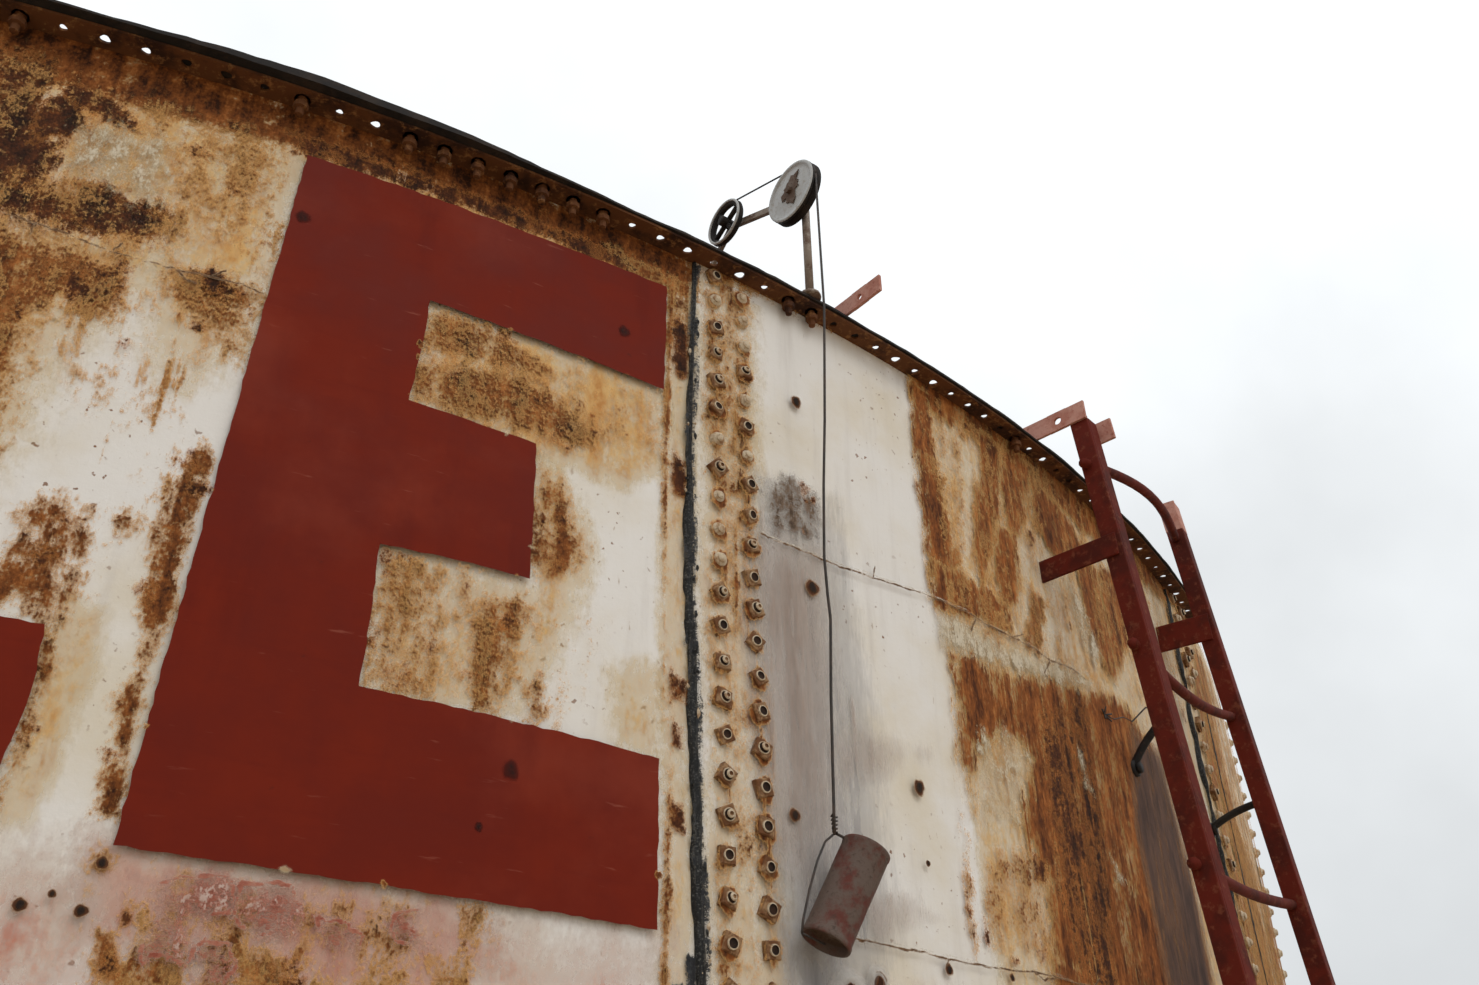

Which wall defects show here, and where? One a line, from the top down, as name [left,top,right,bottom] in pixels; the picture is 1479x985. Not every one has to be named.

rust [0,21,801,985]
rust [805,579,820,596]
rust [907,374,1168,985]